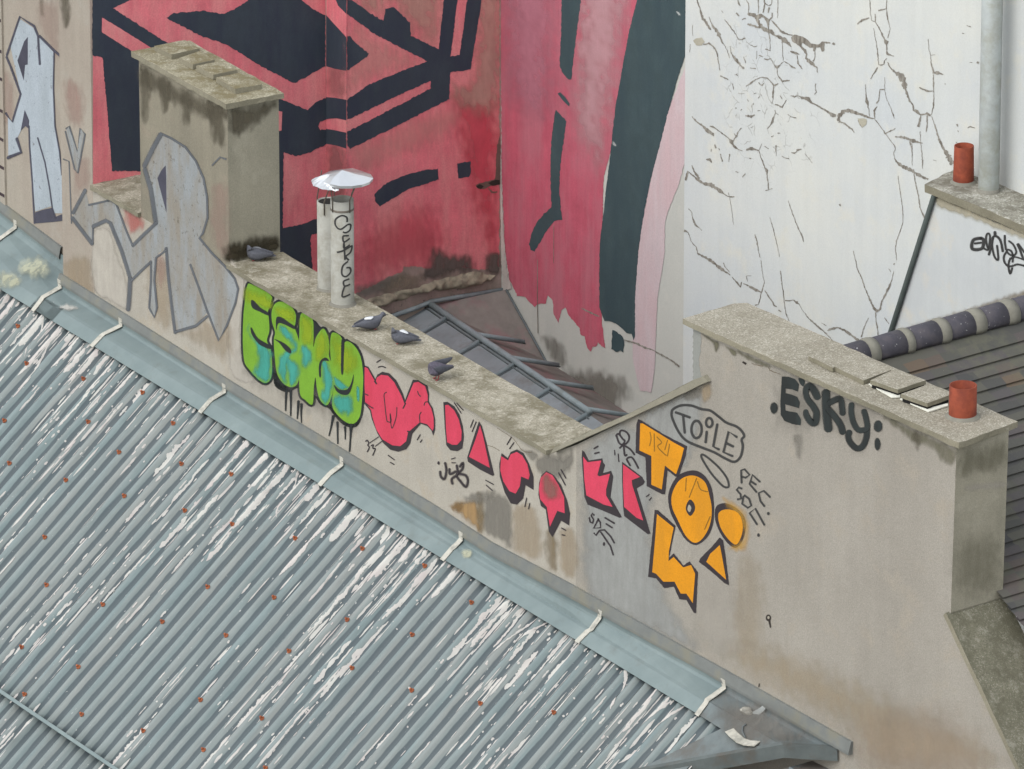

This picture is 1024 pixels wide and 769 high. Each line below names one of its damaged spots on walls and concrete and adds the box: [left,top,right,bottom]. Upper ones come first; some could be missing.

leakage [140,70,275,145]
leakage [224,237,278,261]
crack [684,0,974,341]
peeling [0,290,472,769]
peeling [356,590,697,769]